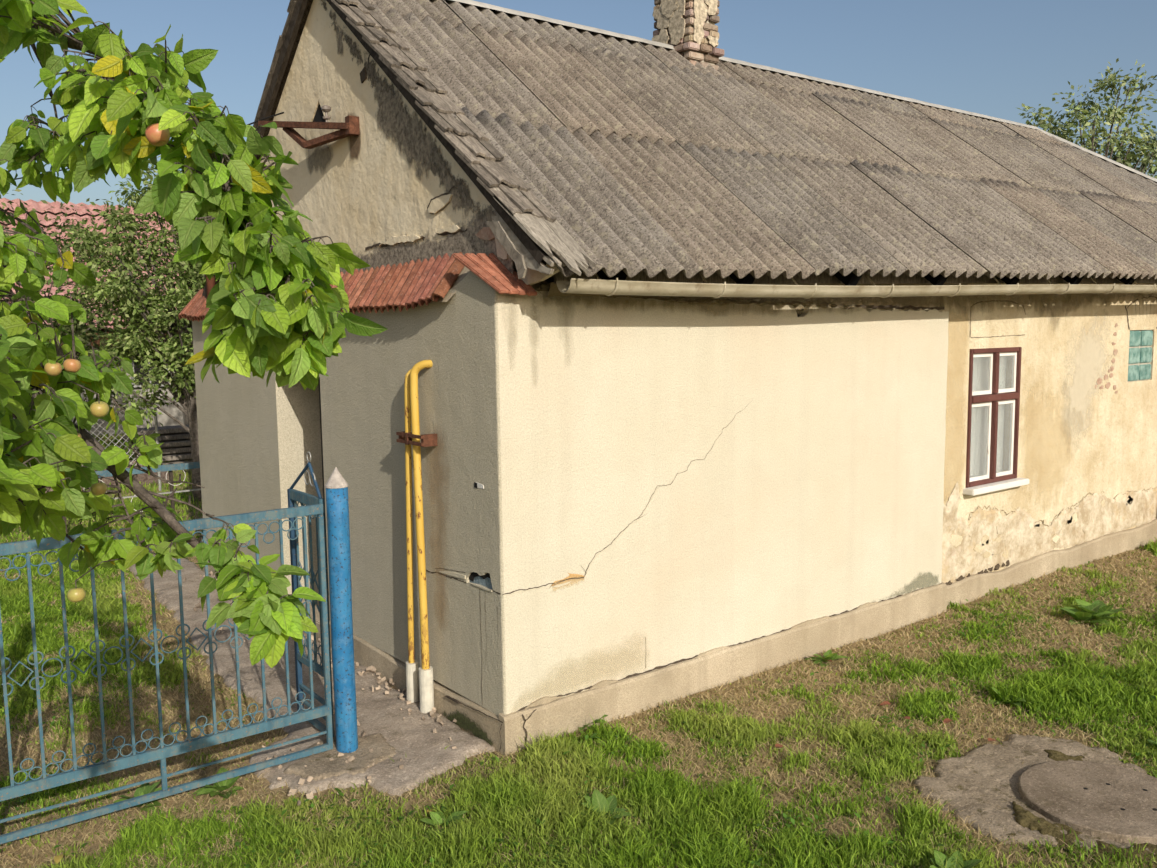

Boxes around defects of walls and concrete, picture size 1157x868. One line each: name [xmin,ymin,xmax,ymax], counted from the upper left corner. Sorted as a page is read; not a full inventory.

rust [348,130,360,158]
peeling [427,185,455,214]
damp [534,278,1157,322]
crack [480,407,746,654]
peeling [941,483,1157,585]
spalling [426,568,501,595]